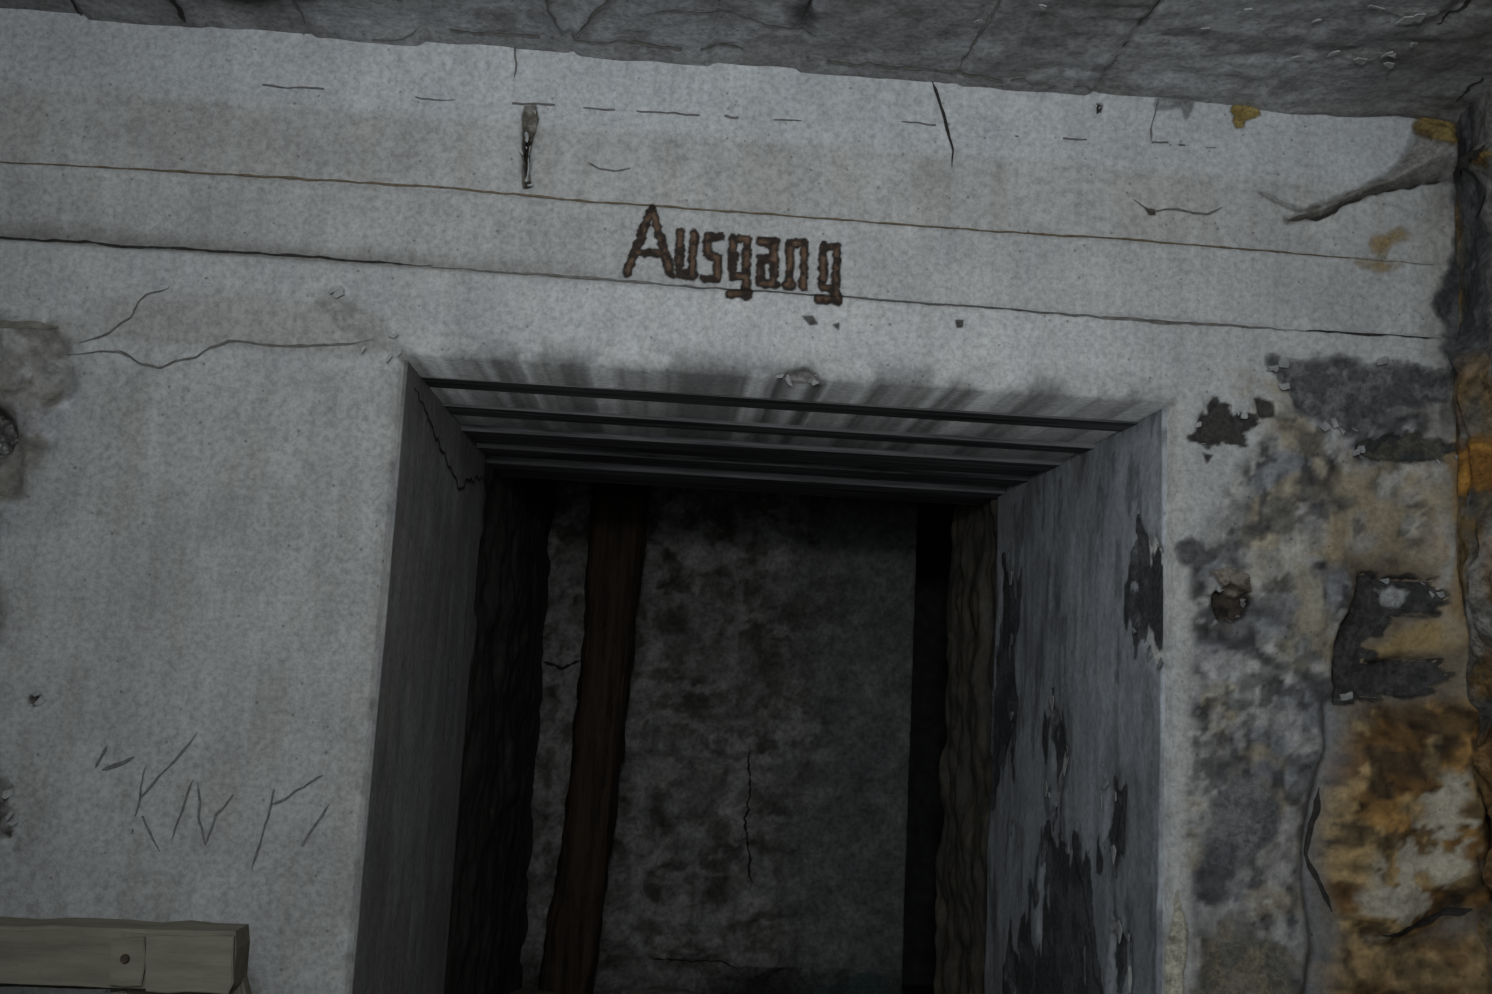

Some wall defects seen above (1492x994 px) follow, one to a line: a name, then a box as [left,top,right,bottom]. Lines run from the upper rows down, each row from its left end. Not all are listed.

crack [262,83,324,91]
crack [372,0,1160,163]
crack [68,287,372,369]
peeling [1187,355,1458,465]
peeling [990,552,1022,811]
peeling [1123,514,1164,670]
peeling [1331,571,1453,706]
peeling [1002,688,1131,994]
peeling [1165,893,1188,994]